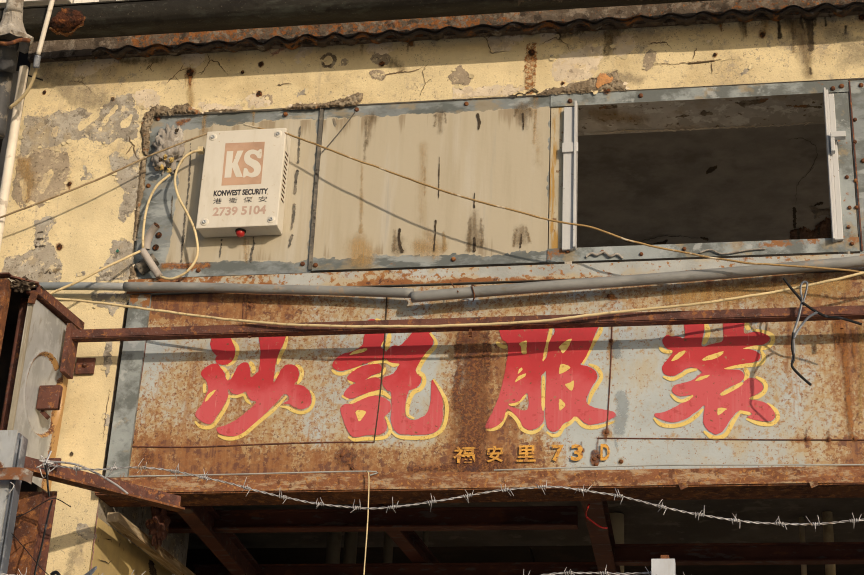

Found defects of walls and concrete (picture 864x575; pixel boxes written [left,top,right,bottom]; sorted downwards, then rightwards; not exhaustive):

spalling [282,88,363,110]
corrosion [523,43,537,94]
peeling [448,32,636,99]
peeling [642,49,658,72]
peeling [1,89,273,316]
peeling [288,126,301,247]
corrosion [408,330,511,473]
corrosion [832,320,856,441]
corrosion [581,428,609,466]